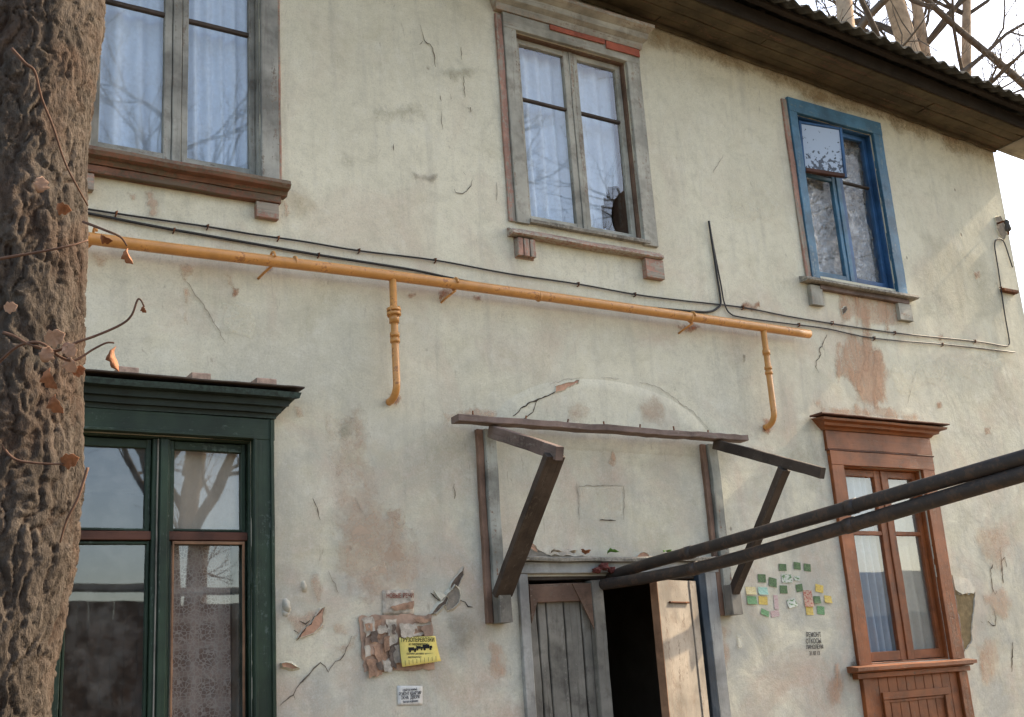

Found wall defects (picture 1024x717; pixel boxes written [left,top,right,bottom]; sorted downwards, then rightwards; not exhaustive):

crack [184,278,225,342]
crack [513,378,579,419]
peeling [294,607,325,641]
peeling [952,575,976,651]
crack [282,636,352,703]